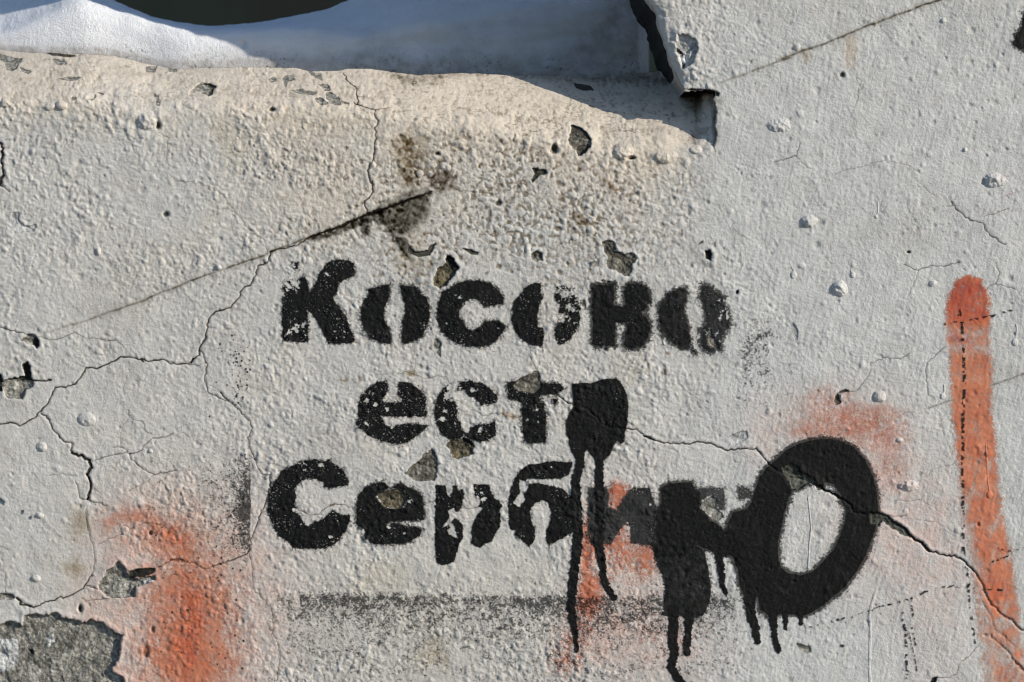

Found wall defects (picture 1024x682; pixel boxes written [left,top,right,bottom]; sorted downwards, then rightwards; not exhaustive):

spalling [552,125,591,156]
crack [0,142,8,190]
spalling [434,248,478,288]
spalling [590,240,636,276]
crack [3,73,432,570]
spalling [0,362,51,399]
crack [626,428,768,463]
spalling [405,449,438,481]
crack [16,575,94,608]
spalling [99,561,156,598]
crack [886,515,1024,671]
spalling [0,605,124,682]